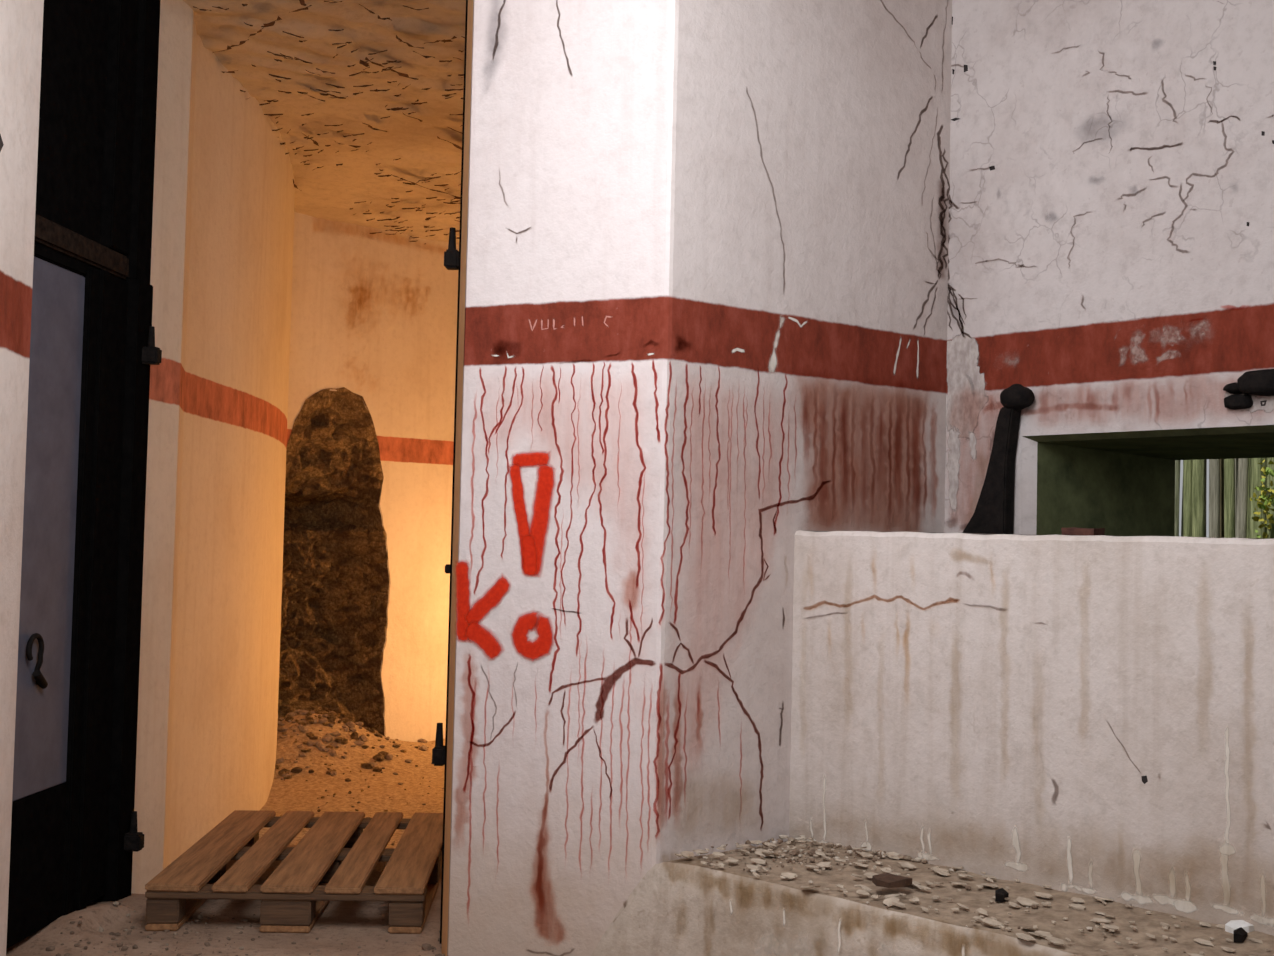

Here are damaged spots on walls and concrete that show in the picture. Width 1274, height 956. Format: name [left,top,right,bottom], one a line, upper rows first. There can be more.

crack [898,97,970,337]
crack [1130,143,1182,151]
rust [474,368,524,593]
rust [538,363,639,691]
rust [652,362,720,624]
peeling [769,317,806,371]
peeling [946,334,988,511]
peeling [1120,322,1207,364]
crack [549,481,830,828]
damp [1061,839,1096,894]
damp [1121,851,1196,913]
damp [1213,728,1274,926]